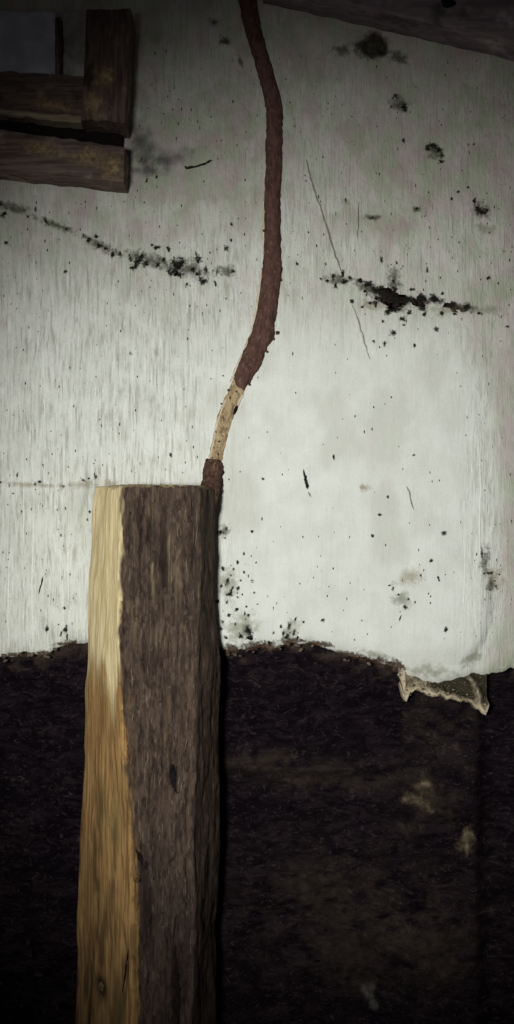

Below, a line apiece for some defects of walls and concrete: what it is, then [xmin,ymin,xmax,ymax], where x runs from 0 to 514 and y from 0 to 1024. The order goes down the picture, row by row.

water stain [335,33,406,68]
water stain [0,201,235,295]
crack [306,160,370,359]
water stain [320,257,483,356]
water stain [216,547,277,639]
spalling [0,625,88,1024]
spalling [215,642,514,1024]